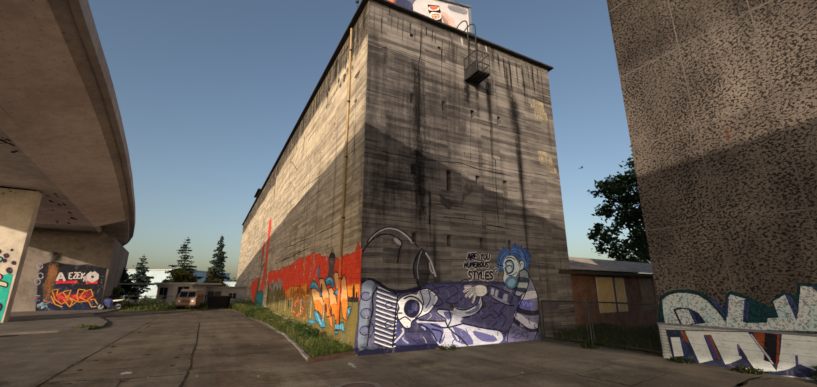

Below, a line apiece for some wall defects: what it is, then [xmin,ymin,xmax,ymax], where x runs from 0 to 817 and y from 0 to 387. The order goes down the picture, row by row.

damp [366,56,491,234]
damp [485,46,548,183]
crack [734,376,788,387]